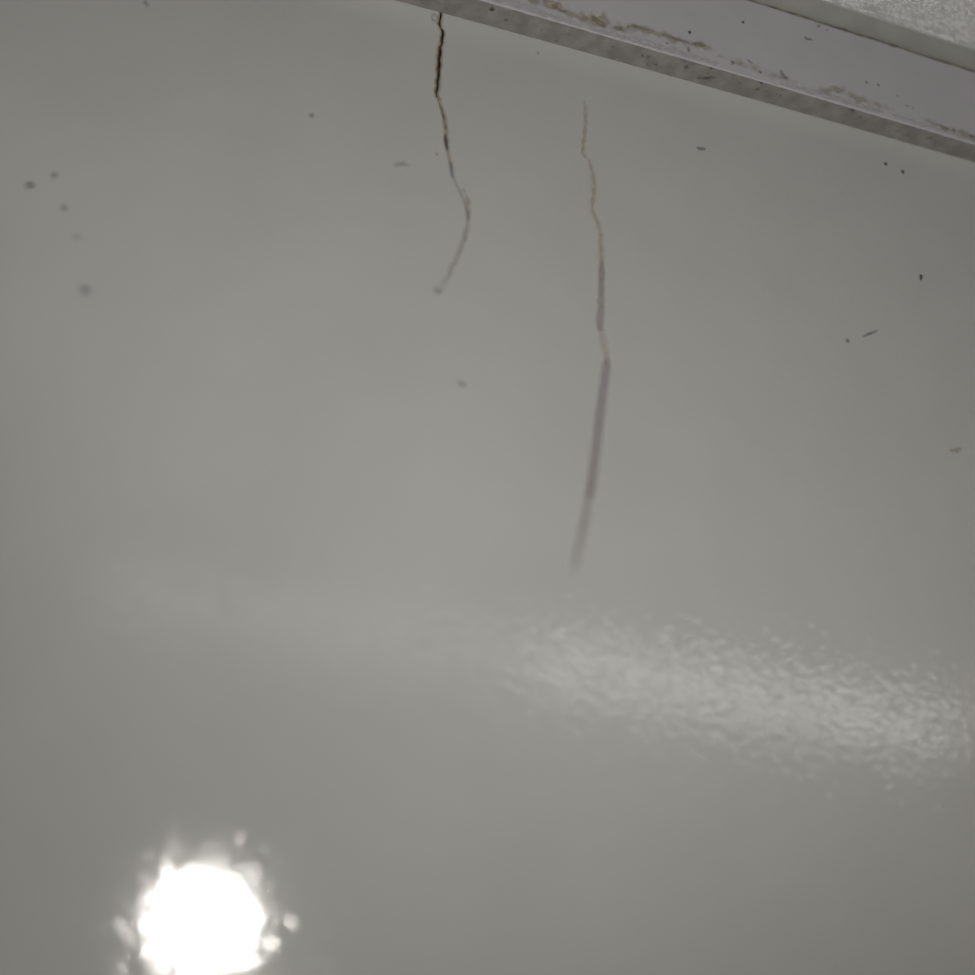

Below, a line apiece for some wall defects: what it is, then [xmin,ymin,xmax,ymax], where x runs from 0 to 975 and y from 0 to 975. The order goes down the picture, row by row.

crack [435,12,454,177]
crack [582,116,609,486]